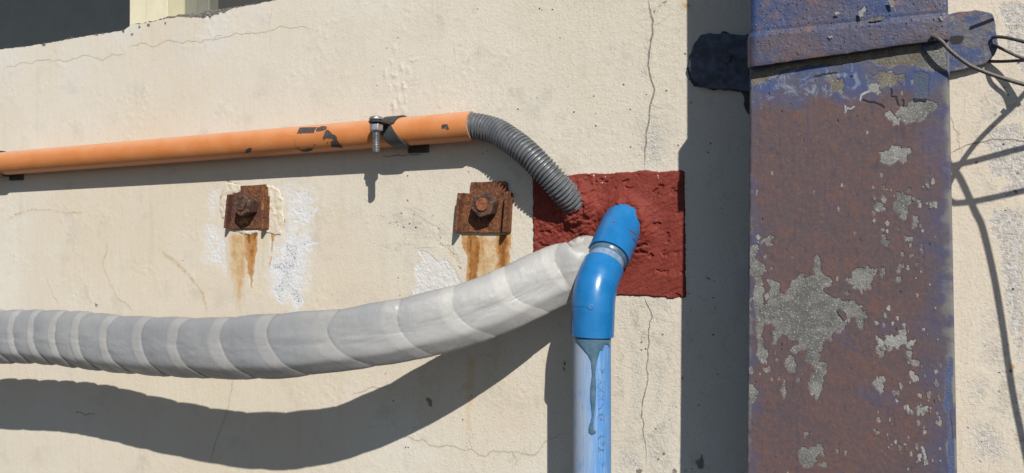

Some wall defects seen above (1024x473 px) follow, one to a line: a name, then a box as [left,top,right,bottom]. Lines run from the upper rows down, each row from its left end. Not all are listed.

crack [5,7,312,68]
crack [636,0,671,170]
rust [225,228,275,317]
peeling [371,193,464,298]
rust [458,230,515,283]
peeling [749,0,1024,473]
crack [613,297,675,465]